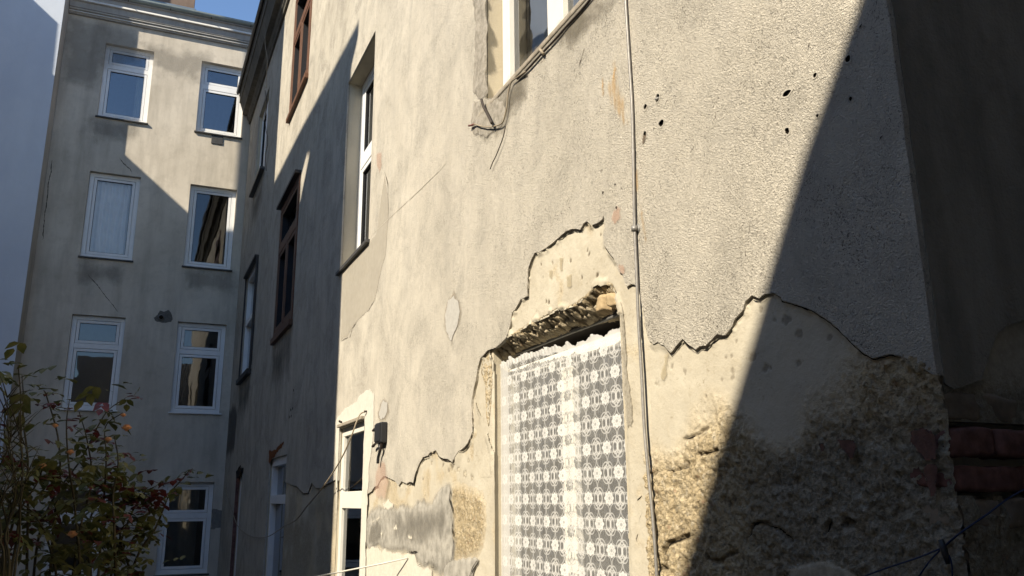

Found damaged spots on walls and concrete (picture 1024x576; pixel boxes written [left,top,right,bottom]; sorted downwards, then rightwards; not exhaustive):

flaking render [365,220,1024,576]